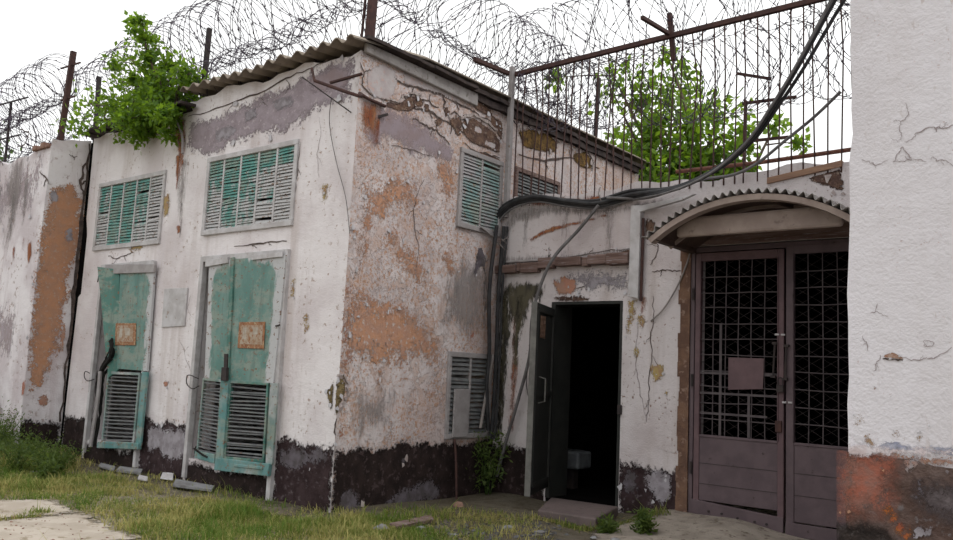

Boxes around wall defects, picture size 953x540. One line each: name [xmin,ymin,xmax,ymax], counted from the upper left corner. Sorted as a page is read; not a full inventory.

peeling [187,54,355,156]
peeling [366,92,503,202]
flaking render [517,125,560,156]
flaking render [572,147,595,171]
crack [864,103,953,168]
peeling [0,153,86,406]
peeling [551,267,645,338]
peeling [277,285,440,472]
water stain [496,281,545,437]
crack [904,340,952,361]
water stain [836,522,896,540]